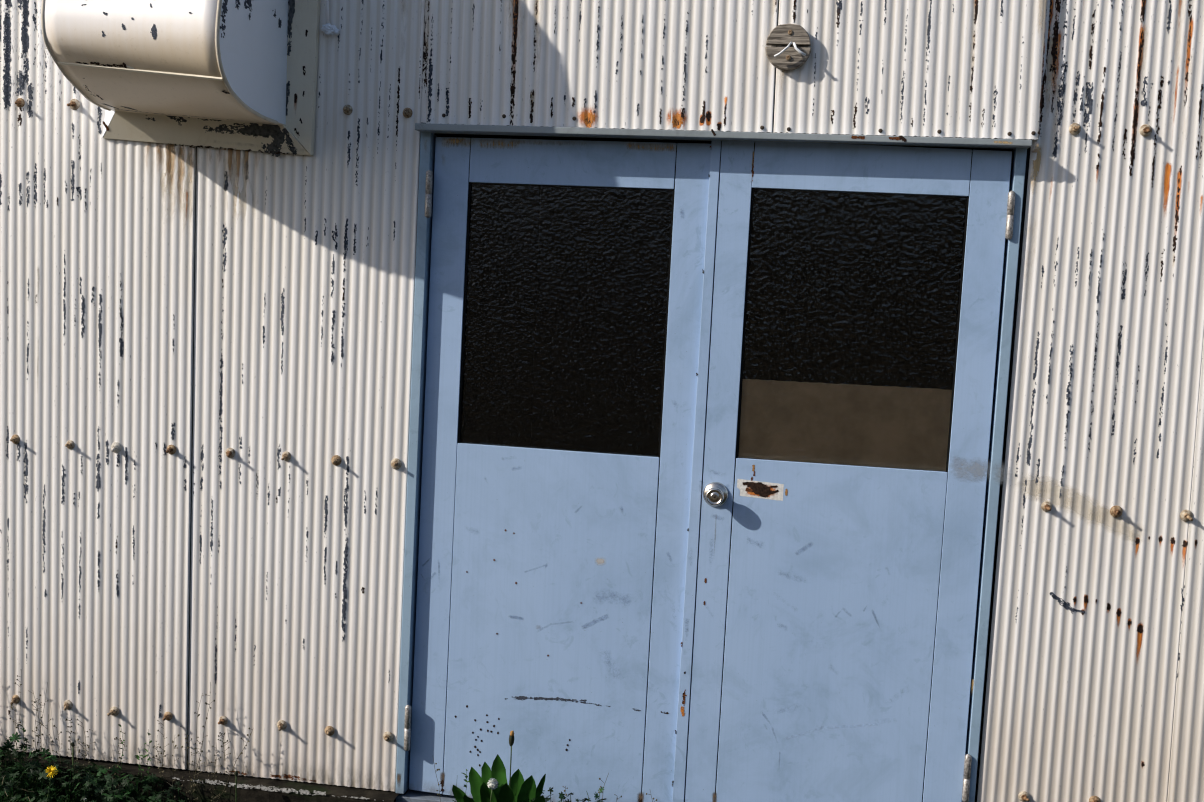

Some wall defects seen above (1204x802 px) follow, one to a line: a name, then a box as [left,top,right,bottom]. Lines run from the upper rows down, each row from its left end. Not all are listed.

damp [168,143,295,154]
corrosion [510,0,518,125]
corrosion [668,111,721,136]
corrosion [1033,0,1061,179]
corrosion [1129,0,1146,176]
corrosion [1175,0,1193,107]
peeling [63,250,102,388]
peeling [5,426,28,503]
peeling [80,426,136,519]
peeling [183,310,224,564]
peeling [324,456,365,642]
corrosion [1073,595,1143,659]